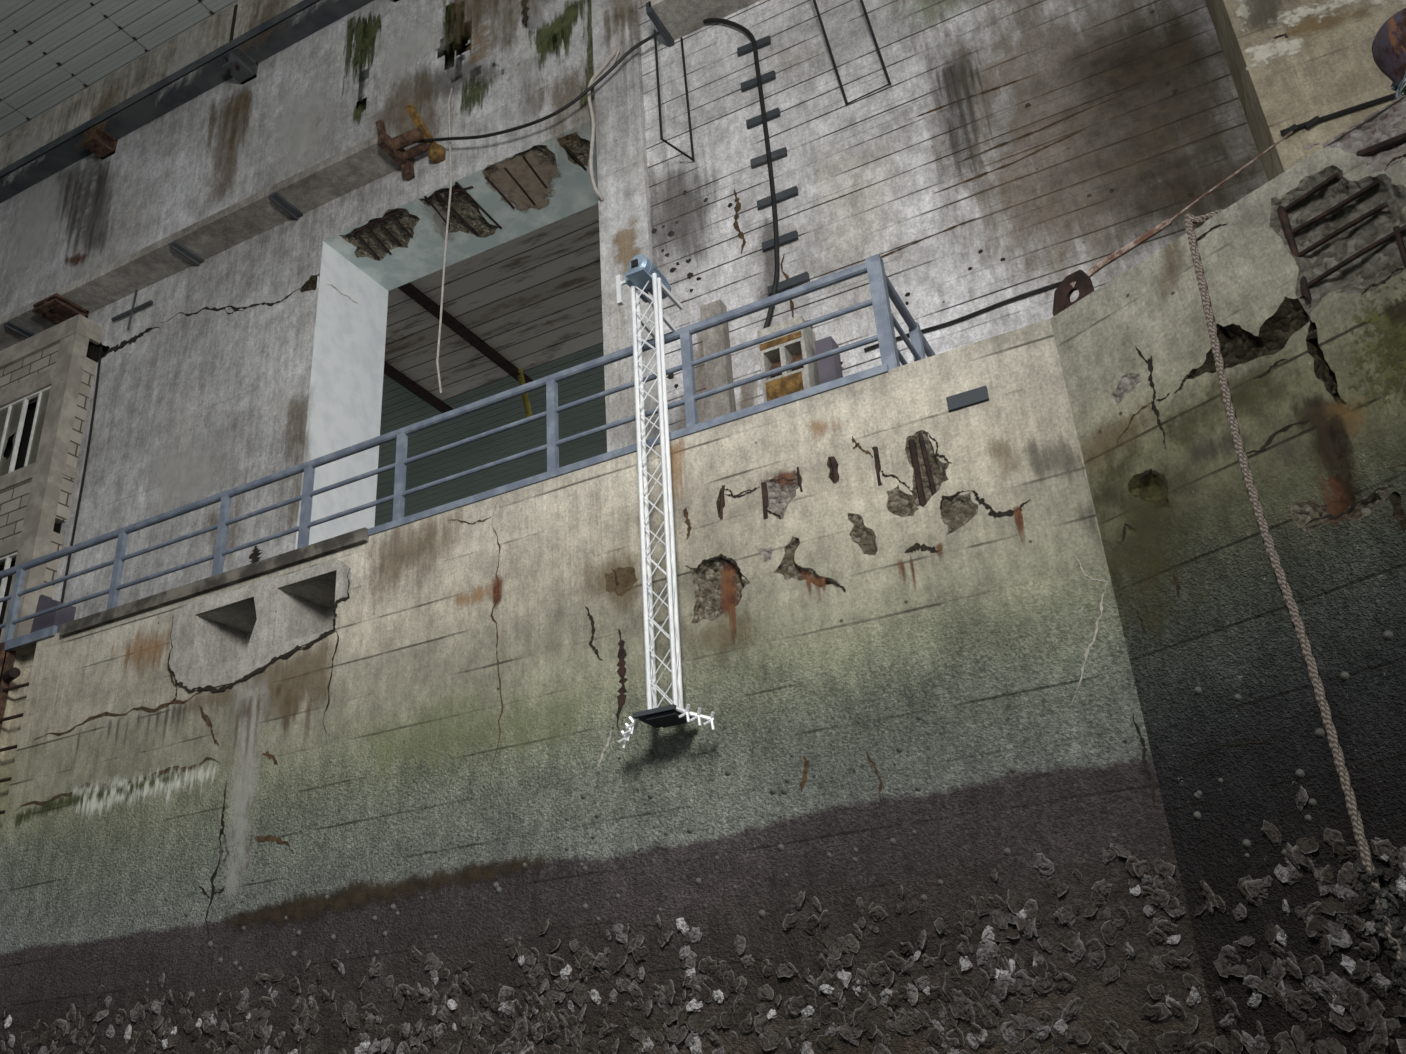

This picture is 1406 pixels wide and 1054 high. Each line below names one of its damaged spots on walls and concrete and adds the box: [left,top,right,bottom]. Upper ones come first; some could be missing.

leakage [342,14,381,94]
leakage [537,25,571,71]
peeling [340,132,590,261]
leakage [1141,175,1235,213]
spalling [1173,95,1406,405]
crack [104,284,357,356]
crack [1254,359,1285,379]
spalling [716,467,803,520]
spalling [871,430,978,536]
rust [1296,398,1358,499]
rust [722,589,736,641]
crack [19,568,350,944]